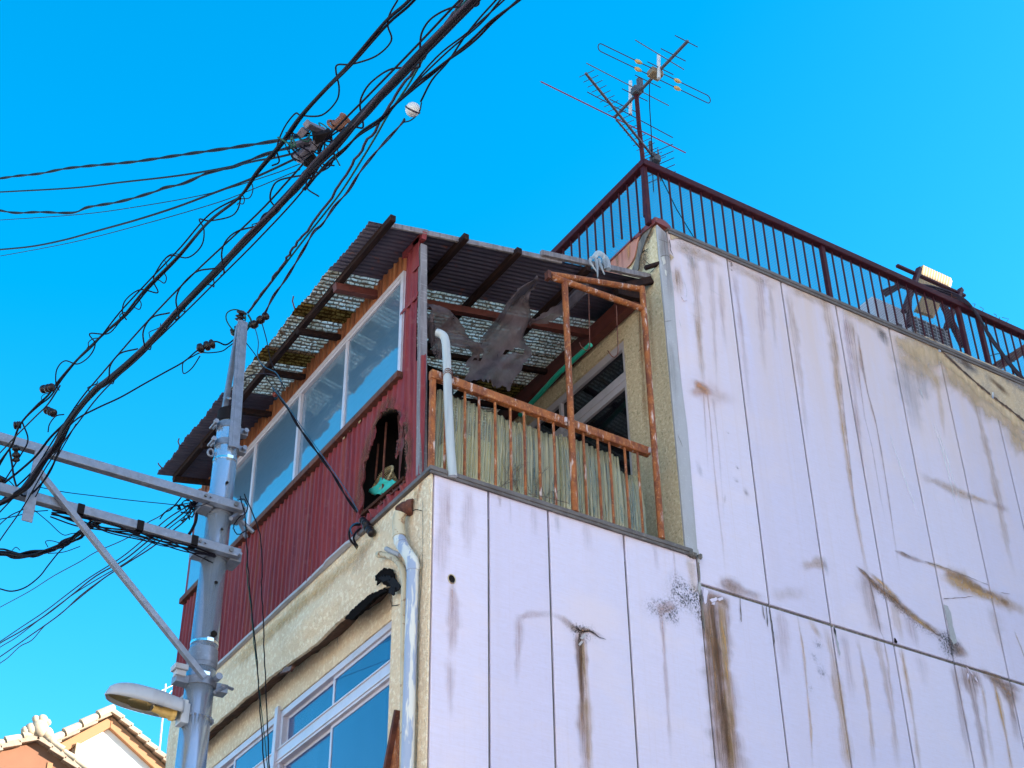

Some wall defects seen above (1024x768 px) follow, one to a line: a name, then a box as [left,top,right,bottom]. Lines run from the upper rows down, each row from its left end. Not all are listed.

damp [897,337,1024,449]
spalling [344,568,401,620]
damp [661,582,702,636]
rust [861,570,930,628]
rust [949,575,1006,603]
rust [571,626,591,738]
rust [704,596,737,765]